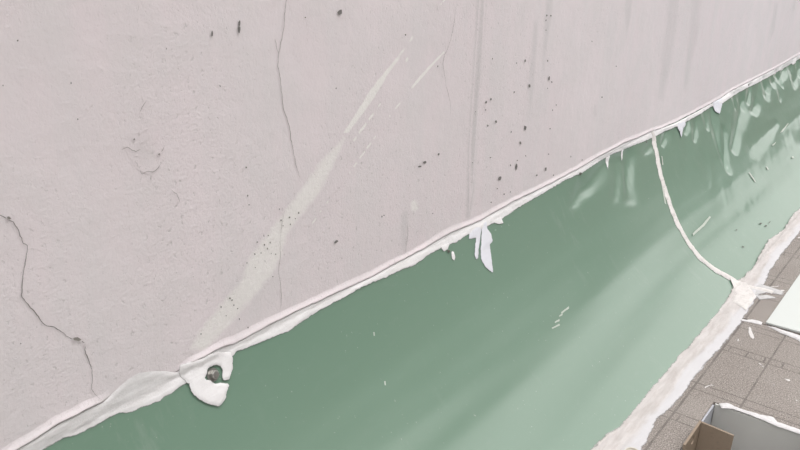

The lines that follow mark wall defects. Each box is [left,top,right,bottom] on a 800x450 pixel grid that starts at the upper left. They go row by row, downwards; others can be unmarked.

crack [0,215,95,394]